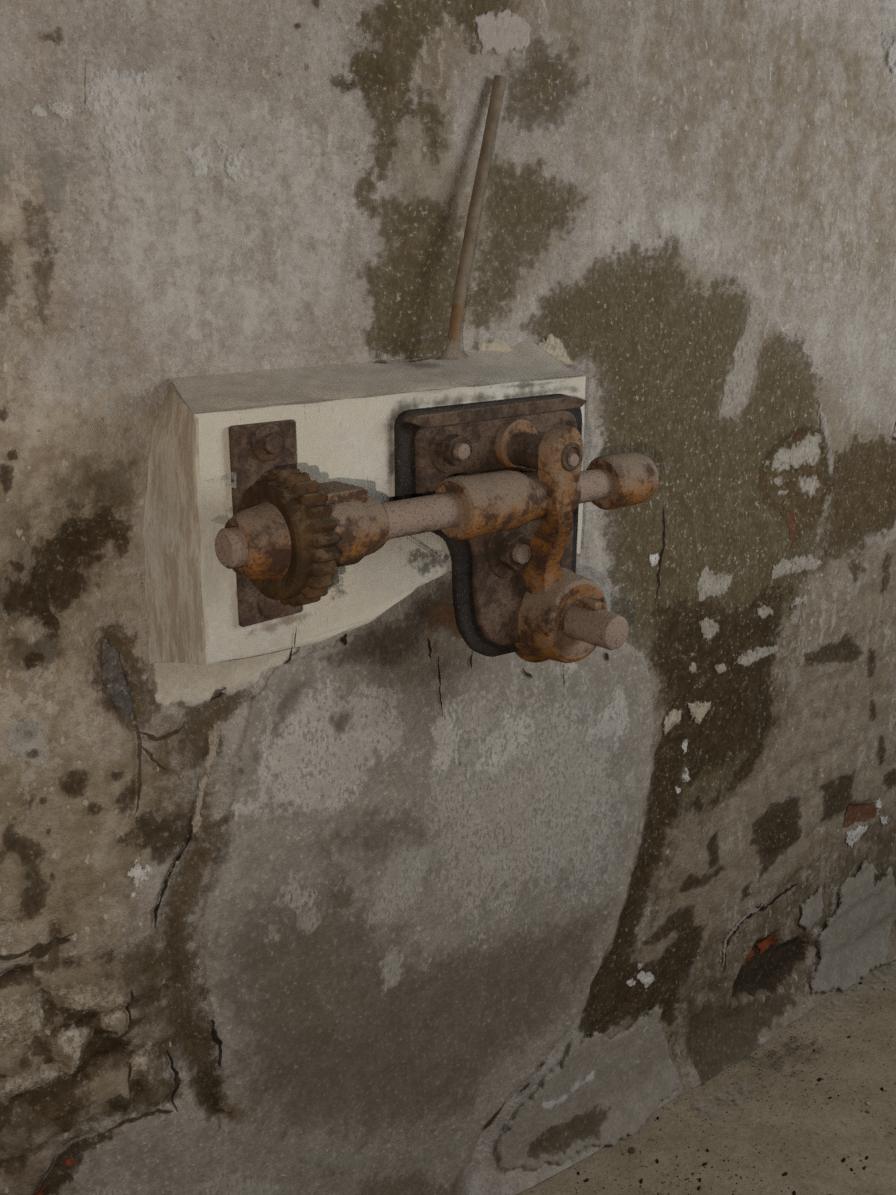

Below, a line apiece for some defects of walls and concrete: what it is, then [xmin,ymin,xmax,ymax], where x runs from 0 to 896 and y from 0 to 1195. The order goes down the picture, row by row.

damp [332,0,590,362]
damp [0,239,896,1144]
crack [133,710,185,816]
crack [154,815,193,928]
spalling [82,1015,146,1070]
crack [126,990,134,1027]
crack [211,1020,223,1067]
flaking render [35,1087,132,1195]